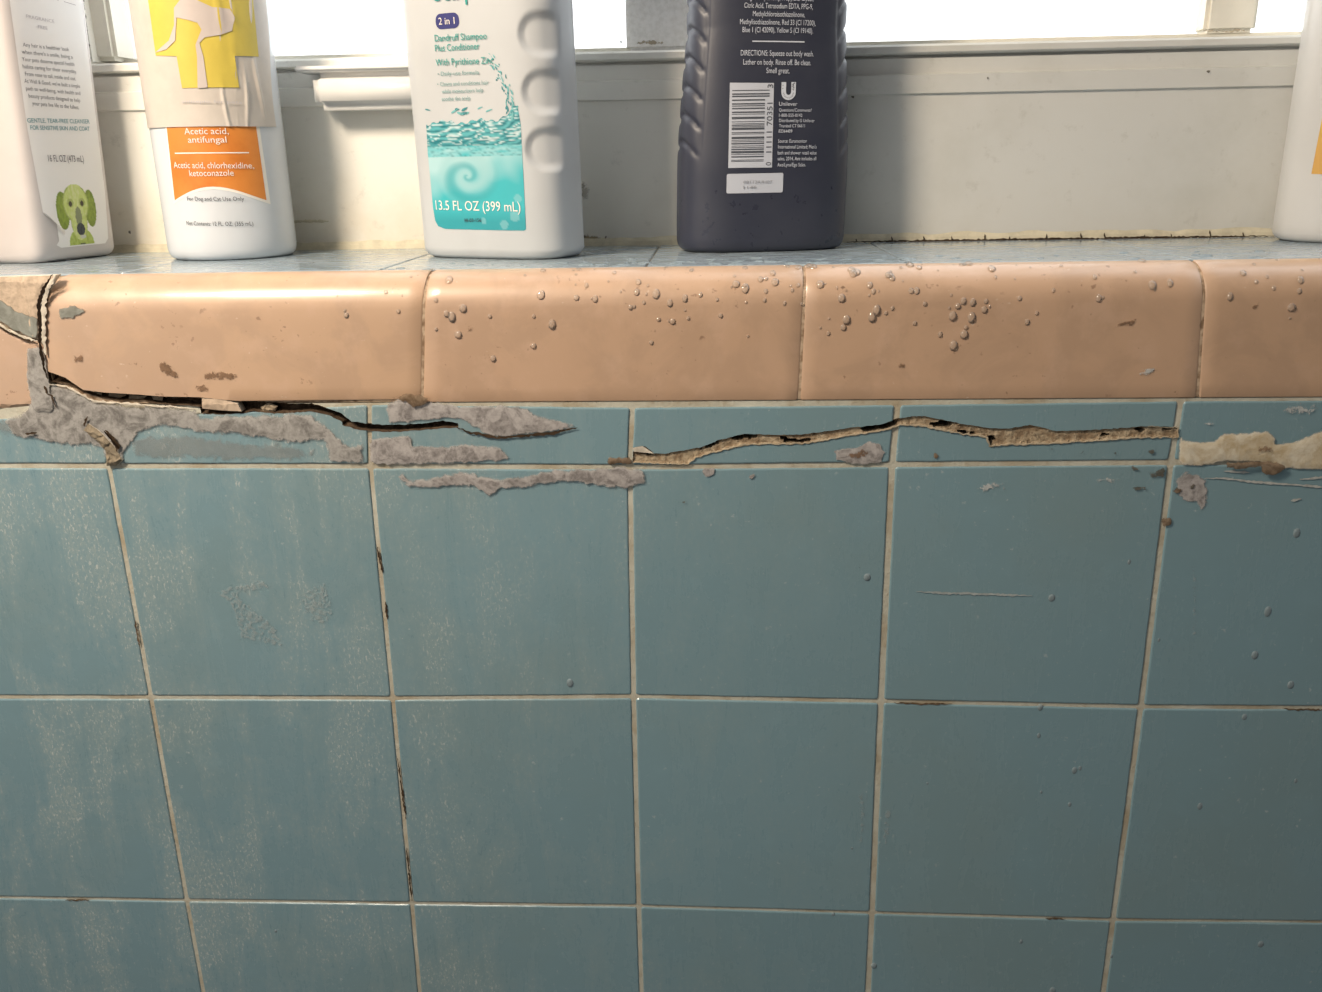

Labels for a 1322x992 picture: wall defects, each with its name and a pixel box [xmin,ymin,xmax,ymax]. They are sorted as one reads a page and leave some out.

peeling [0,300,37,338]
peeling [59,306,84,319]
crack [0,274,576,452]
crack [608,416,1179,465]
spalling [1179,431,1322,475]